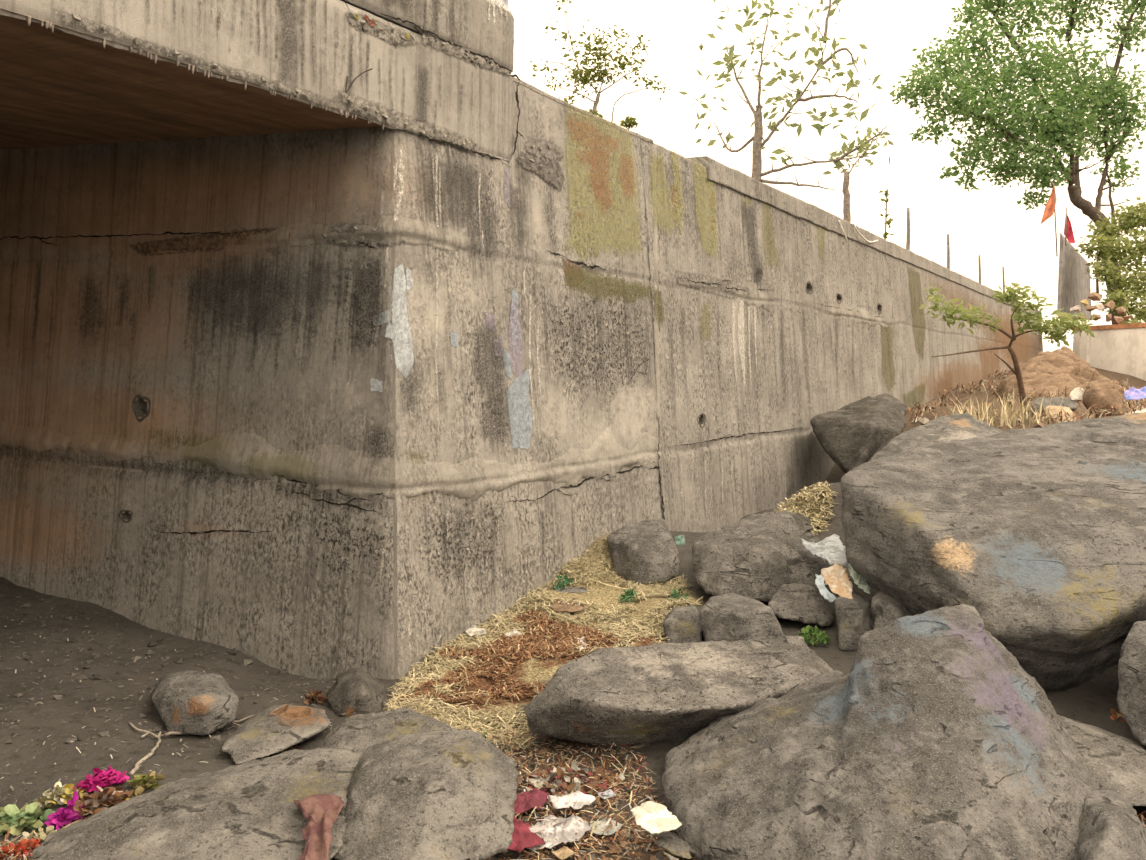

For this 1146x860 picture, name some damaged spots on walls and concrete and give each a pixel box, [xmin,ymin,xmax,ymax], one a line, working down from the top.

spalling [55,10,478,152]
crack [380,13,524,167]
crack [0,227,279,245]
leakage [744,199,762,288]
leakage [345,248,388,353]
crack [504,139,800,520]
leakage [732,300,757,384]
leakage [907,268,926,360]
crack [269,475,383,512]